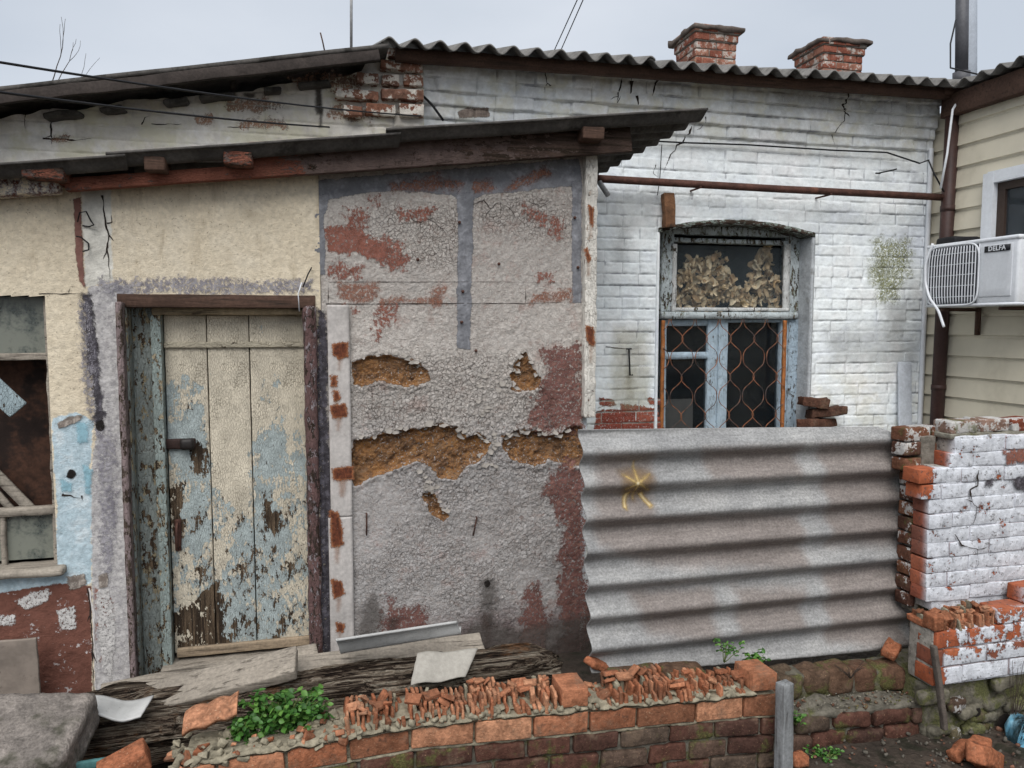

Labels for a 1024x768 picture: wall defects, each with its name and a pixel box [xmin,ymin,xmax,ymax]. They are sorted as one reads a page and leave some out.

crack [832,93,849,144]
crack [101,195,114,275]
peeling [521,202,564,241]
spalling [324,167,551,387]
peeling [529,270,572,305]
peeling [57,415,104,443]
peeling [60,465,93,494]
peeling [351,340,662,650]
peeling [1003,448,1024,465]
peeling [1012,476,1024,491]
flaking render [891,424,995,632]
crack [955,471,992,571]